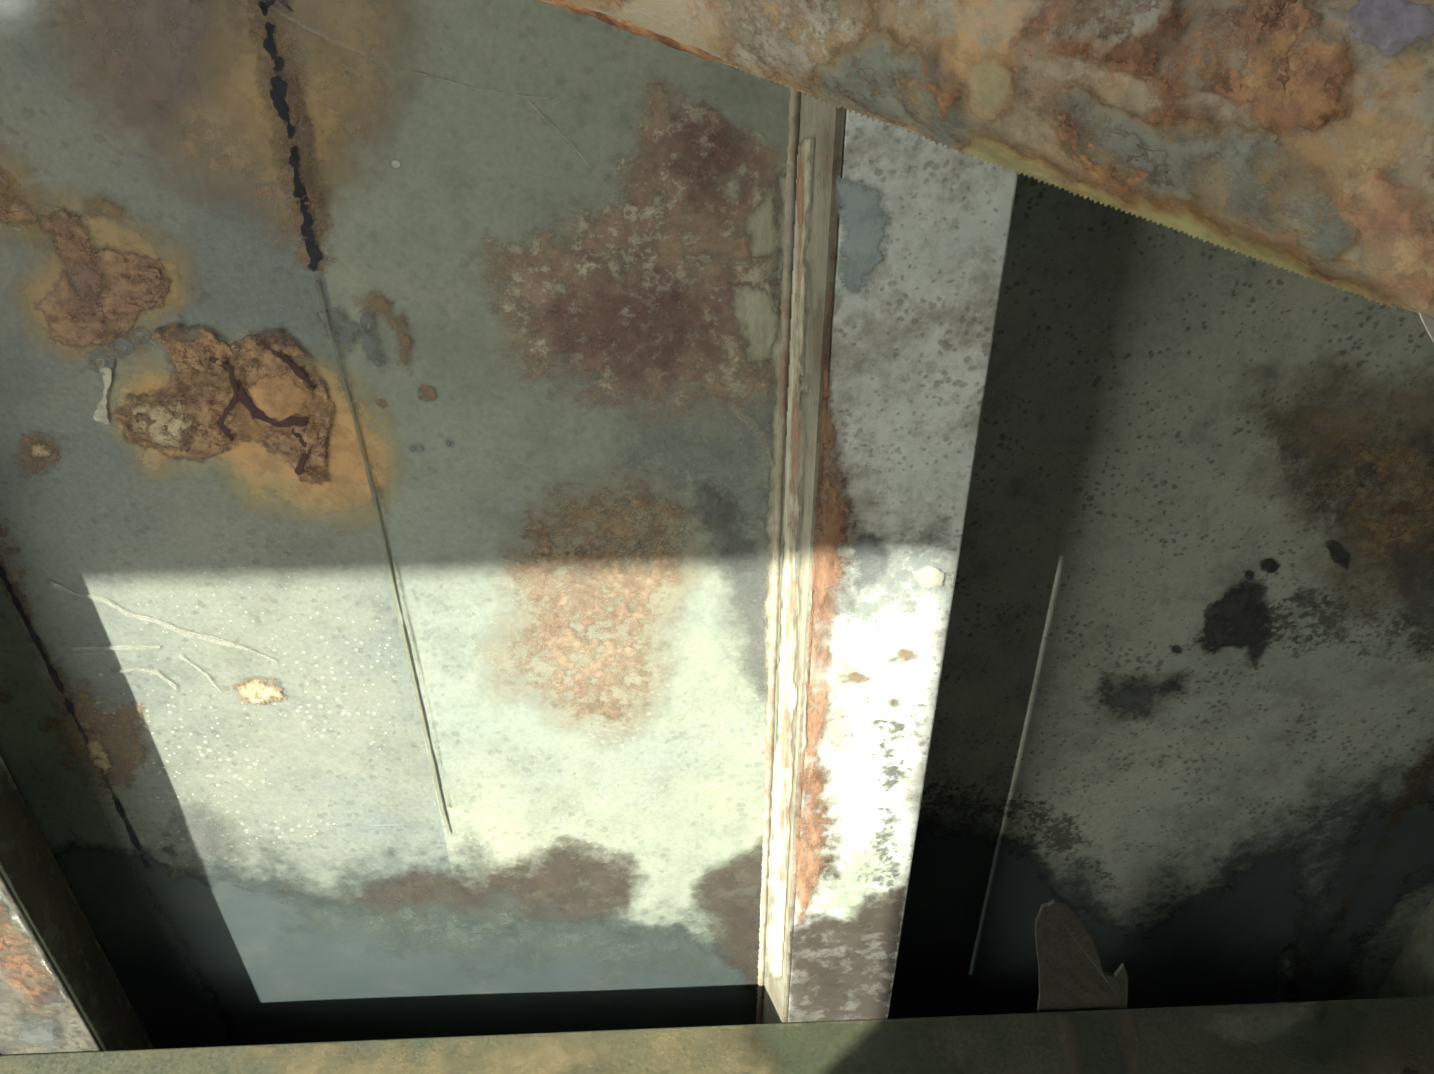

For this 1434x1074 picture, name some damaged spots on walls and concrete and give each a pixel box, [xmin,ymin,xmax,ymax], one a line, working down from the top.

rust [64,0,407,237]
rust [539,0,1434,311]
rust [14,198,393,513]
crack [248,0,449,834]
crack [0,528,151,869]
rust [40,681,147,789]
peeling [233,679,285,705]
leakage [0,765,763,1051]
rust [793,356,856,924]
leakage [785,719,1434,1023]